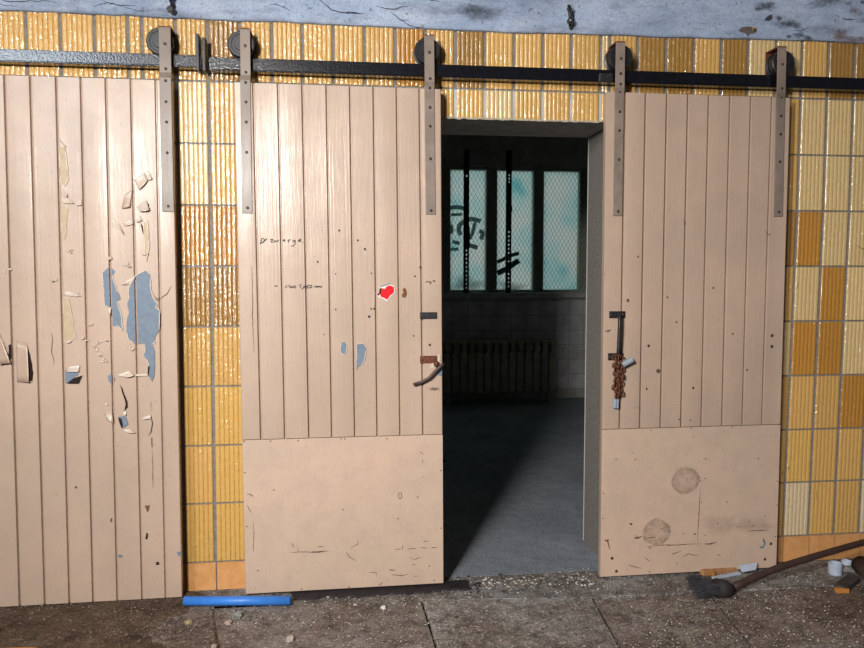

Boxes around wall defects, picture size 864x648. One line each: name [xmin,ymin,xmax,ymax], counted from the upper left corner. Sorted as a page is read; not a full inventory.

crack [1,0,59,8]
crack [320,0,419,28]
peeling [102,172,160,433]
peeling [0,337,33,382]
peeling [340,342,367,369]